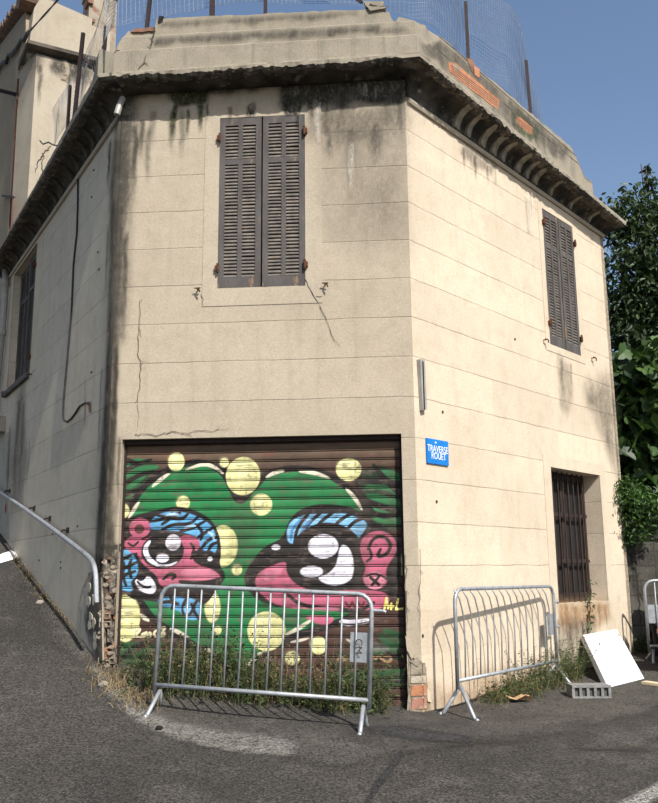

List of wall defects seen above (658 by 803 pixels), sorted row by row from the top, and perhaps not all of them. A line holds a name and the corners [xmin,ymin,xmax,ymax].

leakage [52,58,87,82]
leakage [170,87,259,132]
leakage [281,77,408,124]
leakage [84,95,144,661]
crack [135,300,224,436]
spalling [86,544,121,667]
spalling [405,636,431,712]